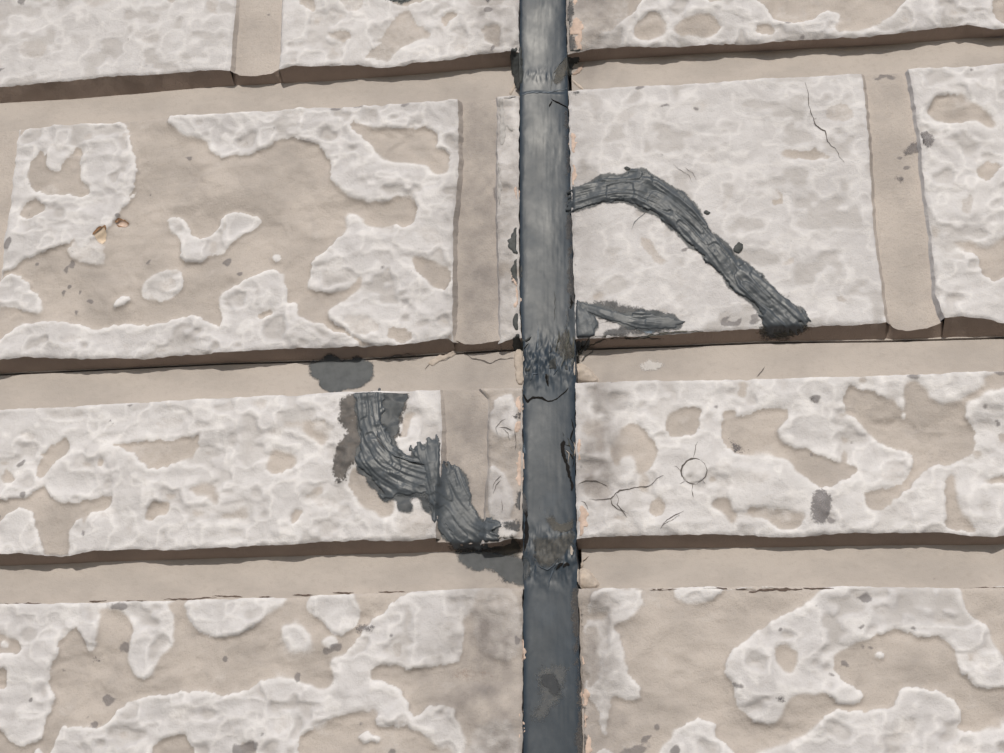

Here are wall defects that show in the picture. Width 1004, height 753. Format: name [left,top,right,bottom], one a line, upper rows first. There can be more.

peeling [570,17,584,50]
crack [805,83,839,155]
spalling [92,218,129,244]
crack [579,445,707,529]
peeling [578,505,589,536]
peeling [580,689,593,753]